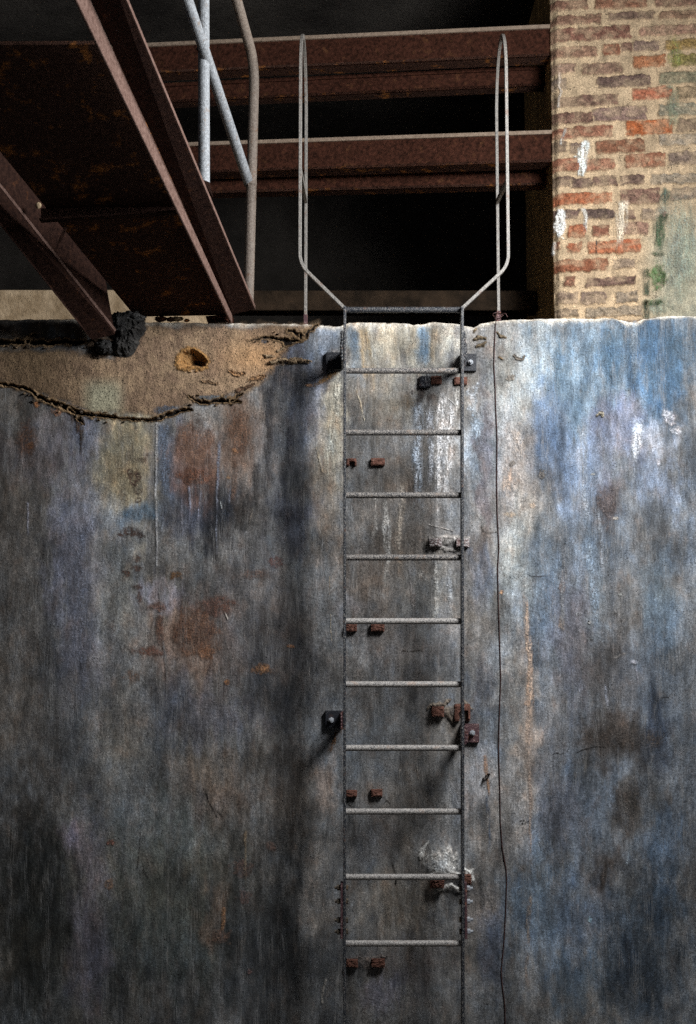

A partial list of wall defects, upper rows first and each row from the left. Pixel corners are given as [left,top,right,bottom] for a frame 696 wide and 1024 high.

damp [574,141,590,176]
damp [553,209,566,254]
damp [616,201,628,242]
peeling [0,324,312,415]
damp [316,382,342,472]
damp [632,419,644,458]
damp [663,410,681,434]
damp [216,387,294,536]